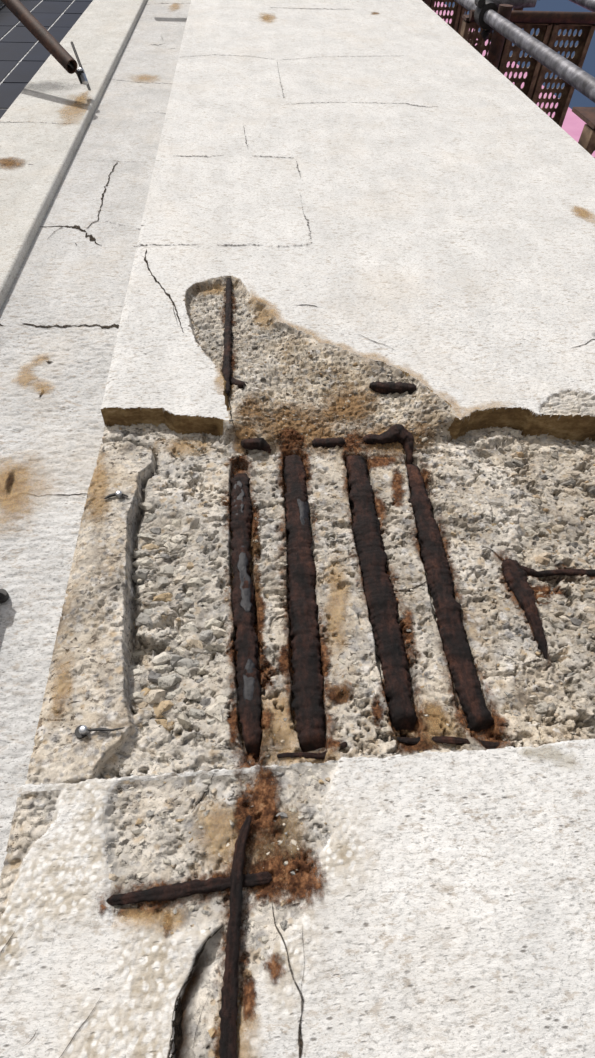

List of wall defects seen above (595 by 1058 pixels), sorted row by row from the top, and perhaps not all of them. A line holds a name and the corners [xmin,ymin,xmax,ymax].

crack [41,161,313,333]
crack [0,322,119,330]
corrosion [0,467,32,508]
corrosion [527,565,595,605]
corrosion [98,389,433,1053]
spalling [0,276,595,1058]
corrosion [371,658,512,753]
crack [272,906,305,1058]